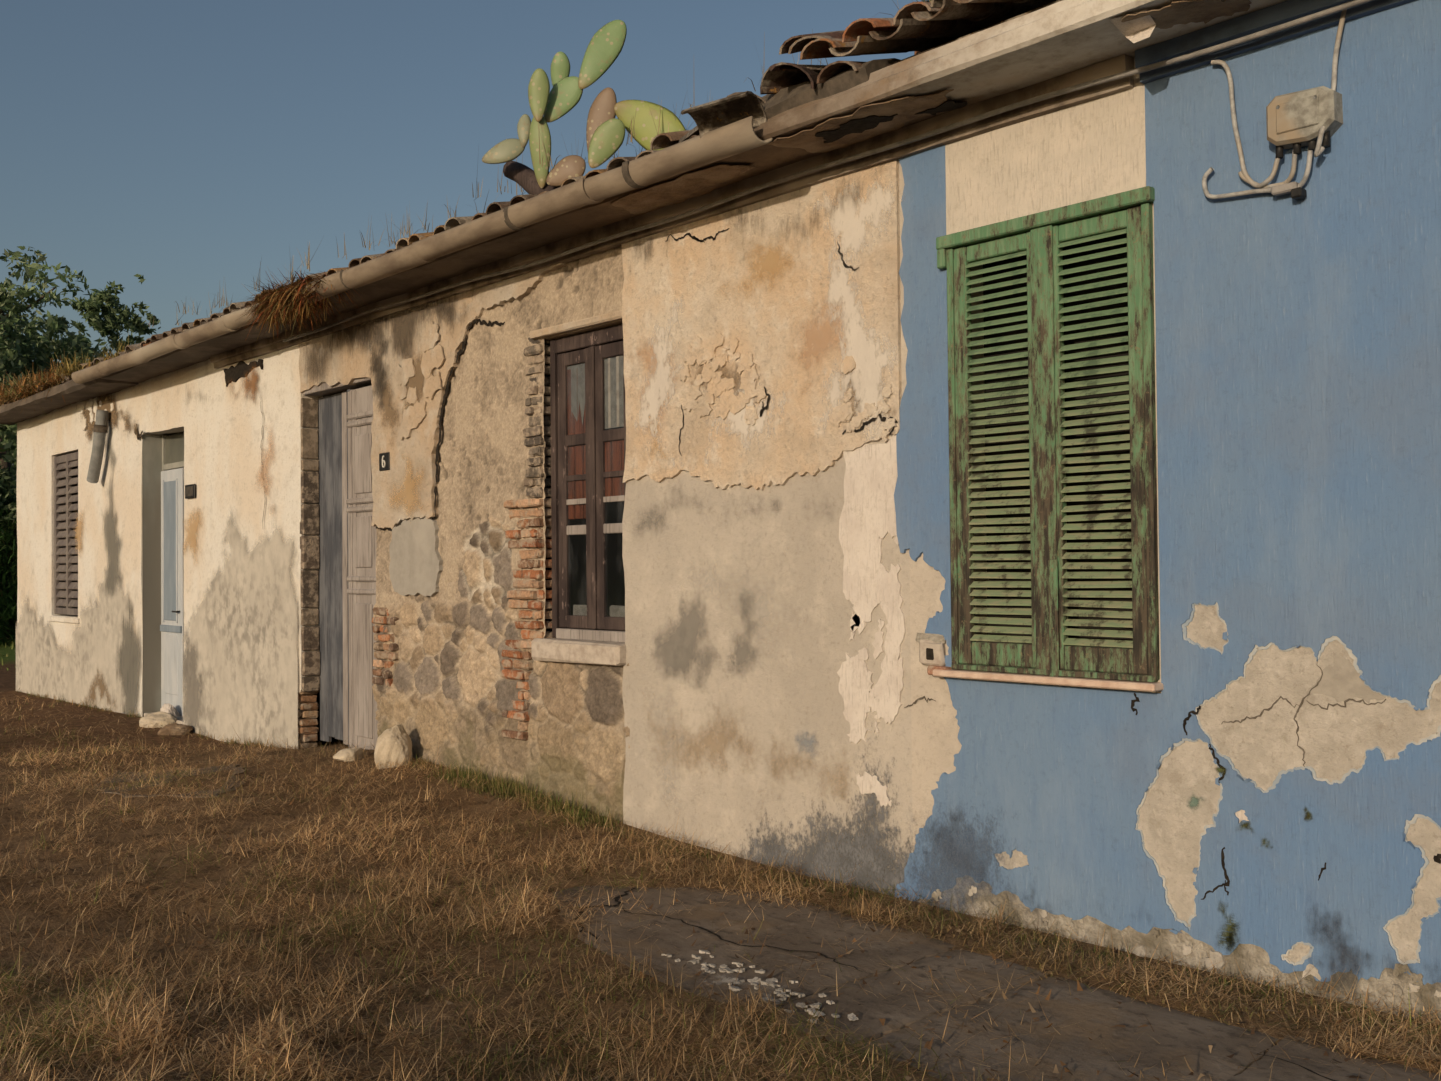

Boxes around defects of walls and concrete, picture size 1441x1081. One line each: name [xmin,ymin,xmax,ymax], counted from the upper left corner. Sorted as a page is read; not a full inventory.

crack [665,228,729,243]
water stain [16,394,139,715]
water stain [183,513,298,749]
flaking render [298,263,566,529]
crack [376,319,505,531]
water stain [656,606,712,679]
peeling [611,0,1441,1003]
water stain [747,767,992,912]
crack [1201,847,1230,900]